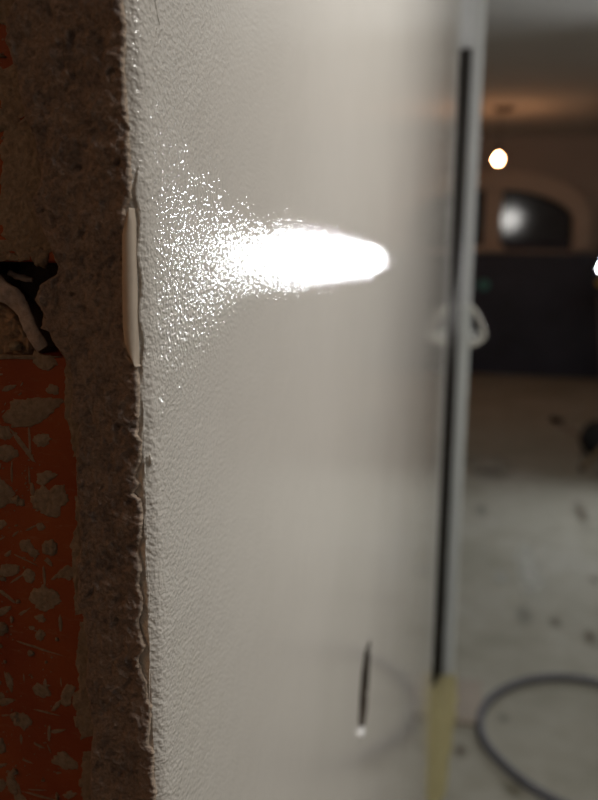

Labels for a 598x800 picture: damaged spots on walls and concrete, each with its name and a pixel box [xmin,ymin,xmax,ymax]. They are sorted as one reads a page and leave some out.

flaking render [5,0,158,800]